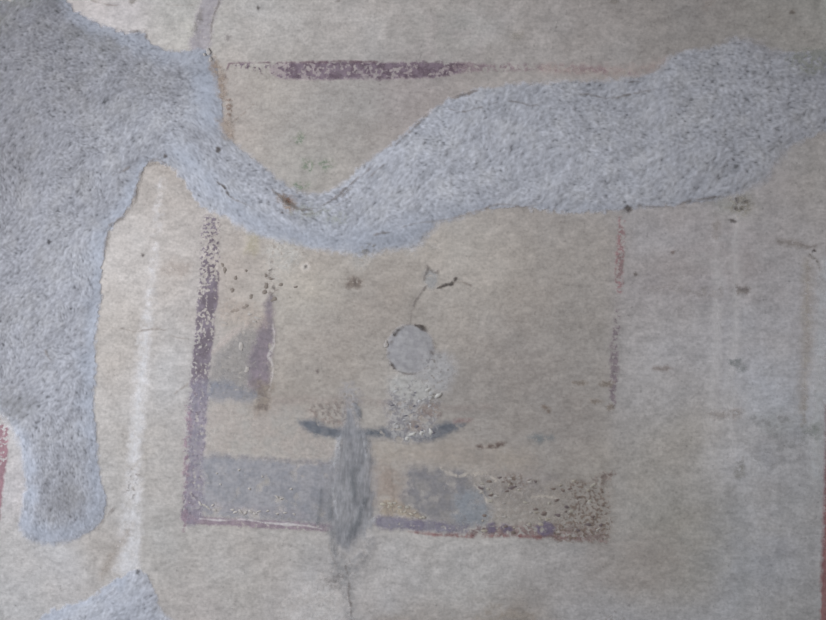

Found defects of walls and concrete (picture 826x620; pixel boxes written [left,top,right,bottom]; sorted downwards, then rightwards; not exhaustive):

peeling [230,274,283,323]
flaking render [389,376,441,442]
peeling [523,479,610,541]